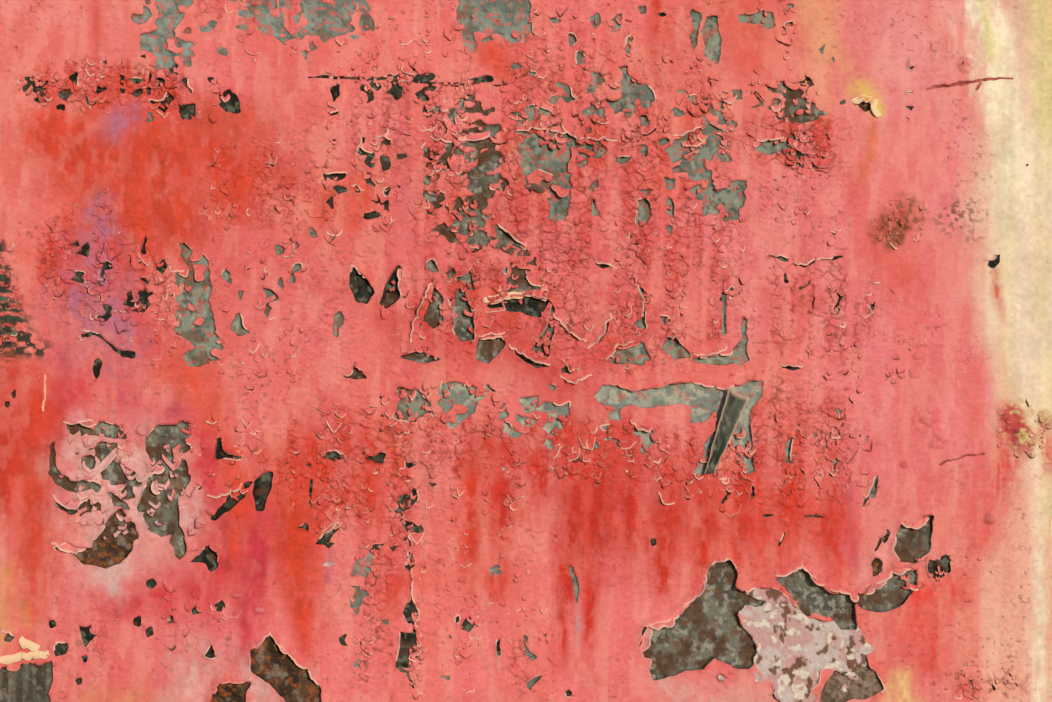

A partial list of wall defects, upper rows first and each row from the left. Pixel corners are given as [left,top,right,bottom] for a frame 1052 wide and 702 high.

crack [926,77,1013,91]
corrosion [446,189,541,254]
corrosion [0,0,426,702]
corrosion [361,291,866,686]
peeling [639,511,994,702]
peeling [0,620,68,702]
peeling [933,662,1031,700]